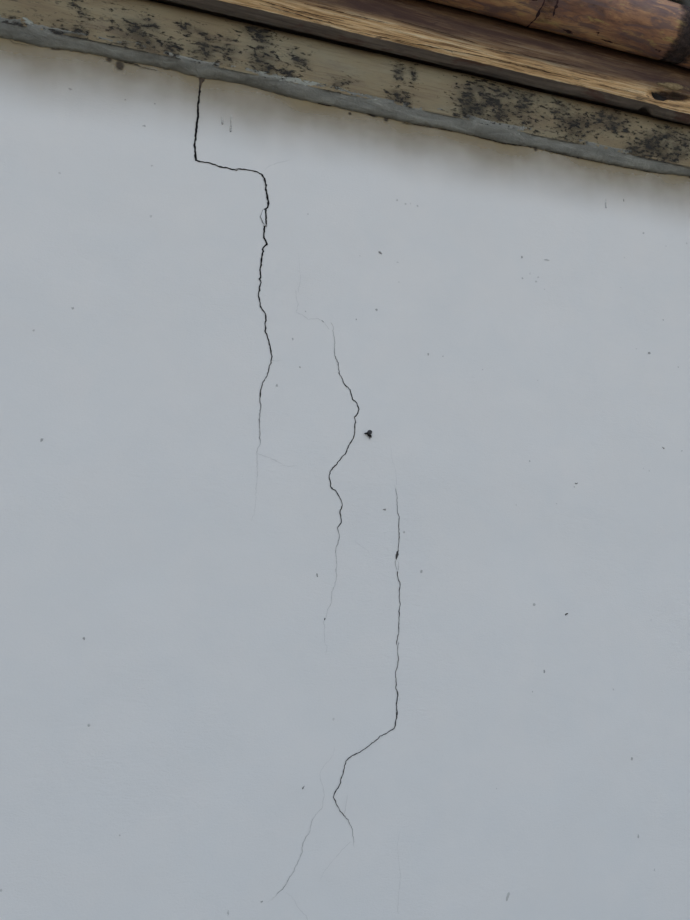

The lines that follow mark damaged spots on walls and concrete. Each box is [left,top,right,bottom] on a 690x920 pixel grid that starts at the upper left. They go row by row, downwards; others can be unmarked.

water stain [41,0,95,39]
water stain [106,3,312,81]
water stain [0,38,690,189]
crack [193,78,273,439]
crack [329,349,359,541]
crack [333,493,401,834]